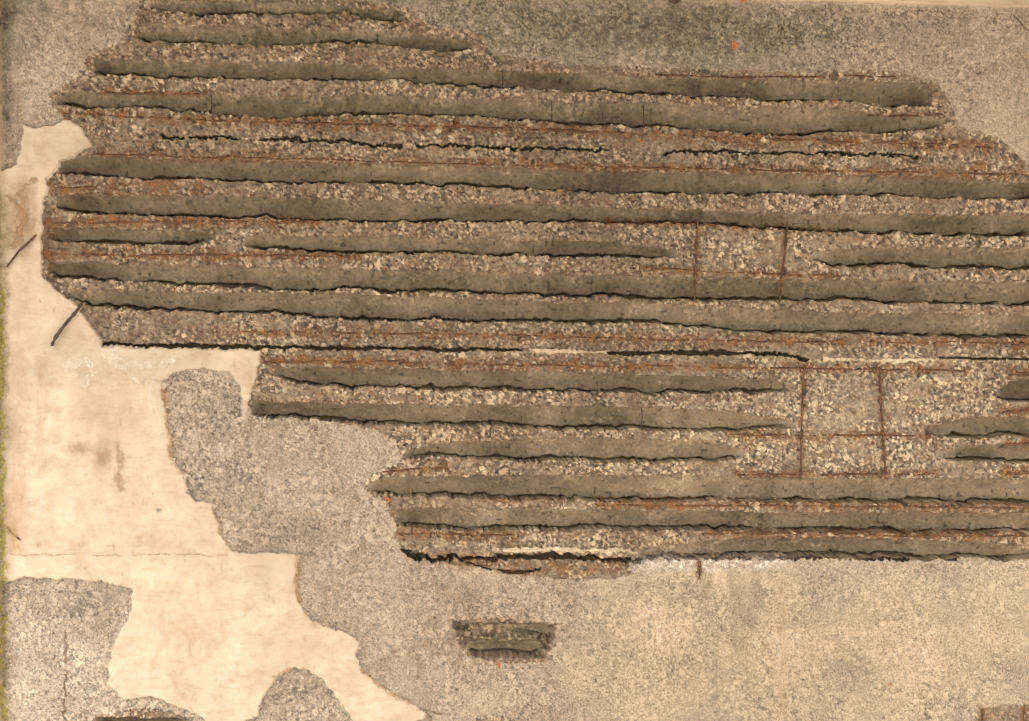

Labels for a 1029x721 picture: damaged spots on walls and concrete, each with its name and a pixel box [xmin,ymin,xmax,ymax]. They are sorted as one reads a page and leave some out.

rust [60,108,526,134]
spalling [1,0,1029,360]
rust [625,129,1023,180]
rust [41,208,361,263]
rust [715,222,847,298]
rust [213,327,1029,375]
rust [782,362,969,416]
rust [598,497,1029,512]
spalling [162,347,1029,721]
rust [793,526,1021,541]
peeling [1,577,205,721]